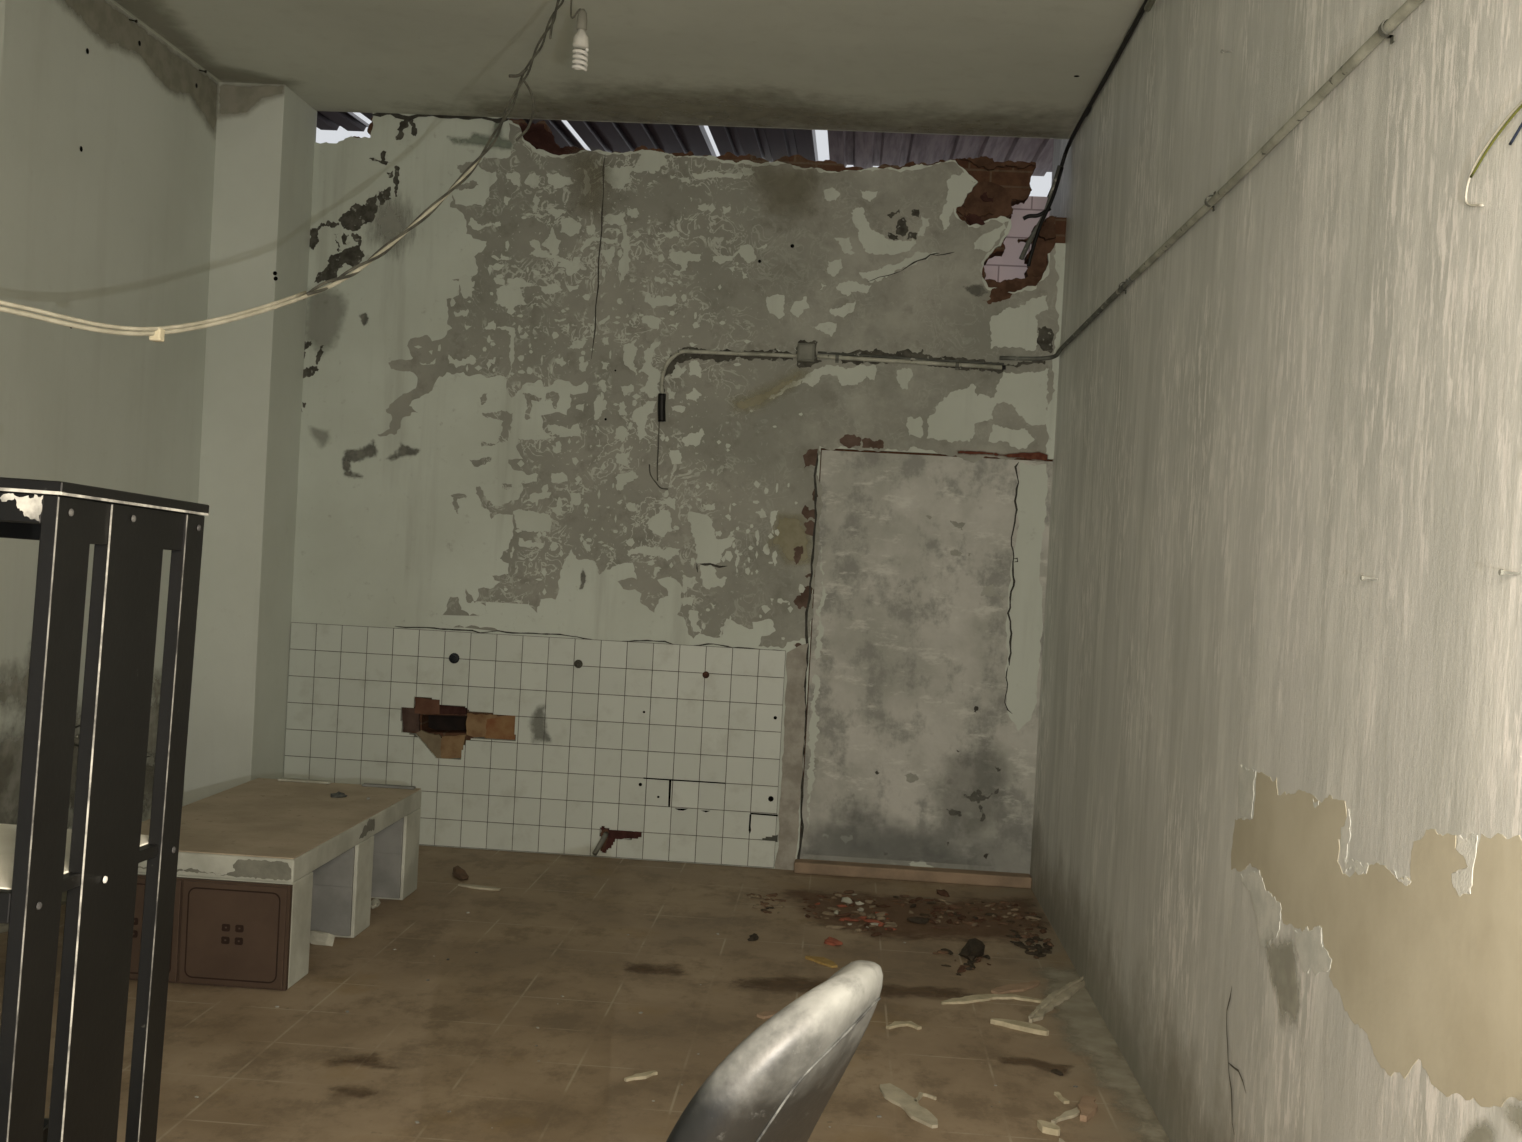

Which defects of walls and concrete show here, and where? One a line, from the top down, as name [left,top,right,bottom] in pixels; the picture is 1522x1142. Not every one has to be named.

water stain [63,0,284,131]
flaking render [309,120,417,283]
flaking render [303,341,324,378]
peeling [378,122,1059,845]
water stain [0,735,24,825]
water stain [144,679,161,808]
peeling [1231,764,1522,1107]